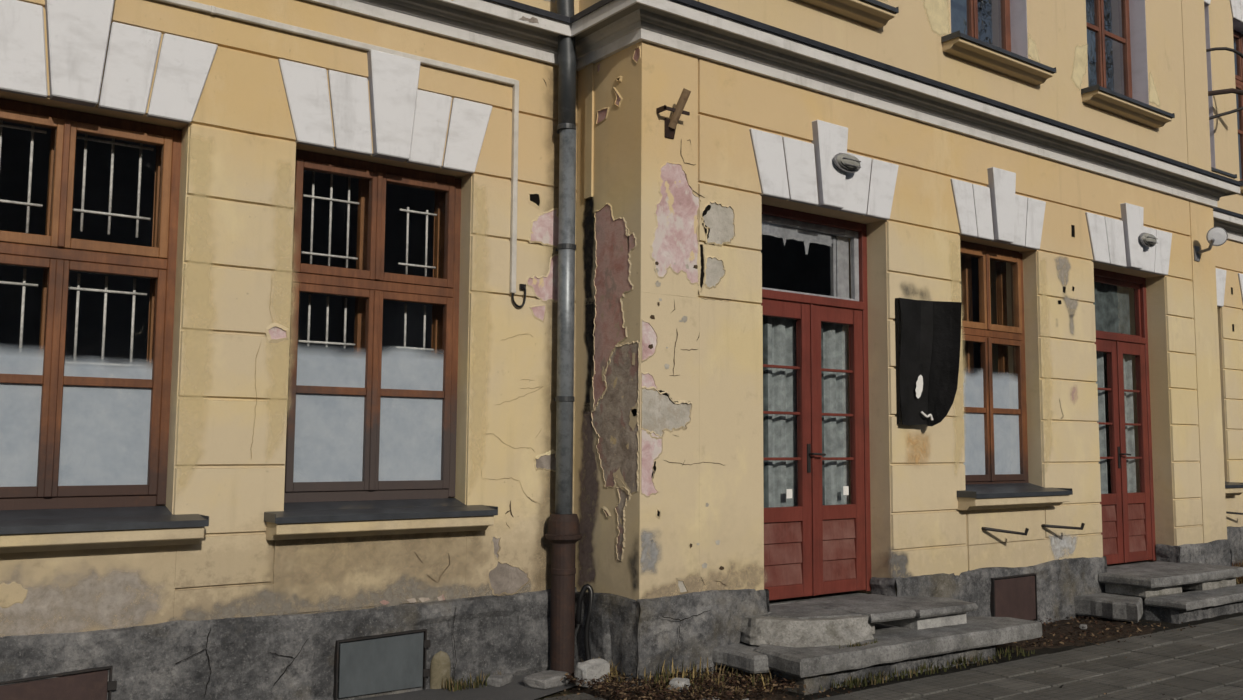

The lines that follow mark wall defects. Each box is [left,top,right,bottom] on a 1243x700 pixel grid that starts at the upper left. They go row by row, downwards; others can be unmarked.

leakage [552,131,560,202]
peeling [526,191,559,323]
crack [251,280,273,458]
leakage [550,303,558,445]
flaking render [591,161,735,562]
crack [480,379,542,527]
leakage [547,472,556,502]
leakage [0,571,158,636]
spalling [487,535,530,596]